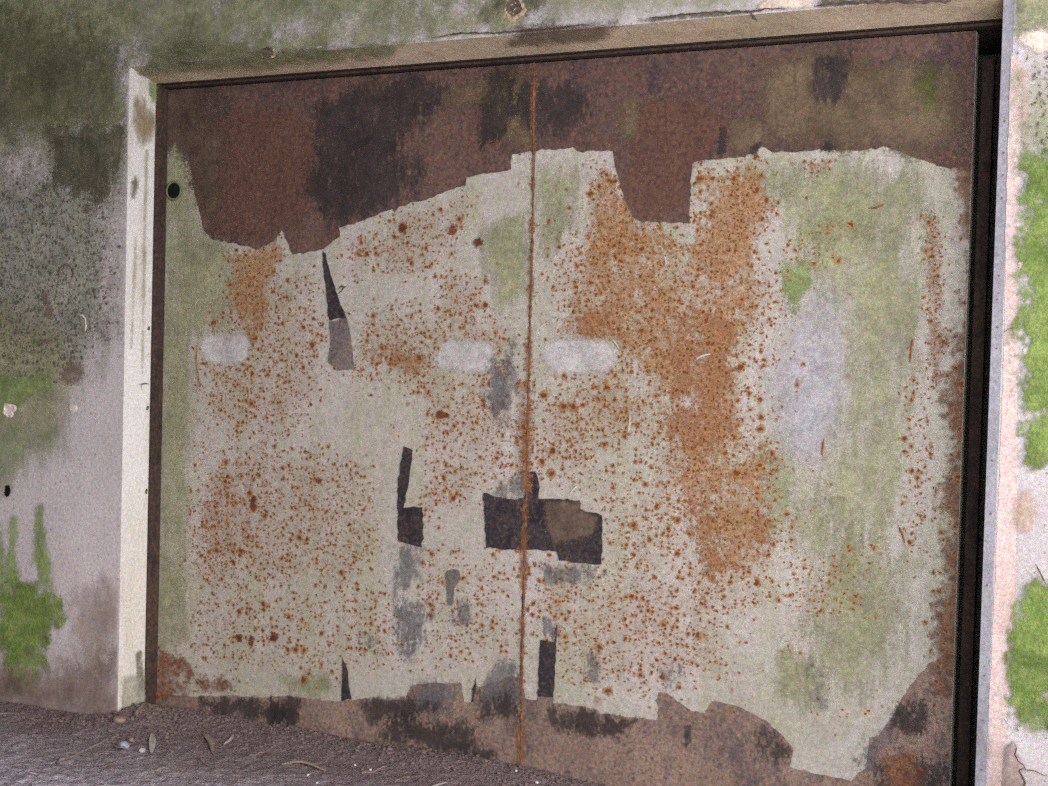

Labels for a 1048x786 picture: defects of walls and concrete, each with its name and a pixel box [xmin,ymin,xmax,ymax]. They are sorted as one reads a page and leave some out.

leakage [134,98,156,142]
peeling [167,31,976,370]
peeling [1019,29,1048,53]
leakage [0,124,125,470]
peeling [397,447,424,547]
rust [156,154,886,763]
peeling [483,471,603,565]
peeling [156,617,954,786]